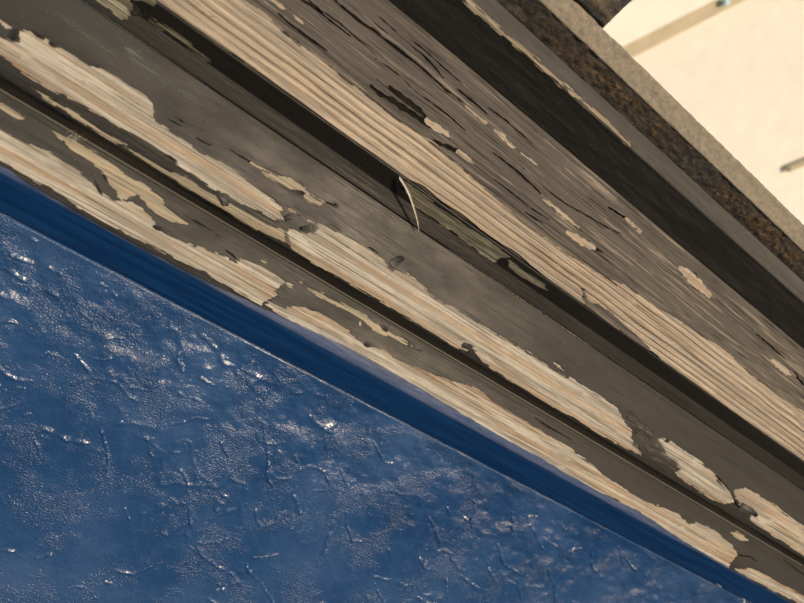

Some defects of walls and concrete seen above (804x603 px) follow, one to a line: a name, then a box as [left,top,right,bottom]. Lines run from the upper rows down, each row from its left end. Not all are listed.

peeling [0,0,804,461]
peeling [0,128,804,603]